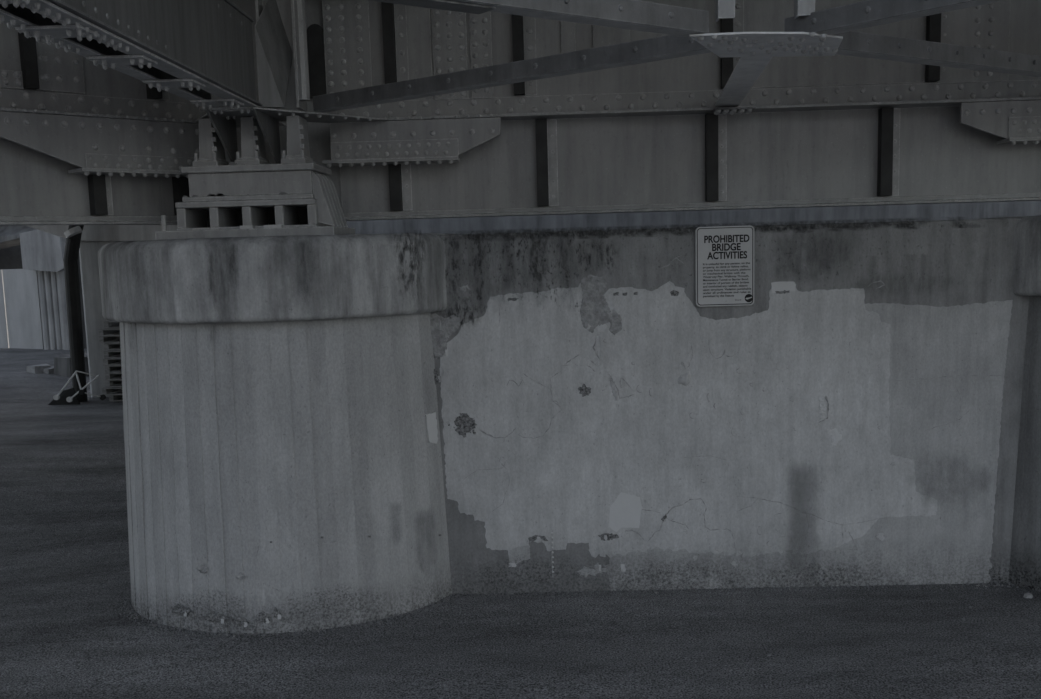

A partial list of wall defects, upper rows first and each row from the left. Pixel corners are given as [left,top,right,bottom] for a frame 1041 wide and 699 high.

peeling [580,275,638,365]
spalling [578,375,592,397]
spalling [447,413,477,438]
peeling [598,533,619,548]
spalling [169,604,281,627]